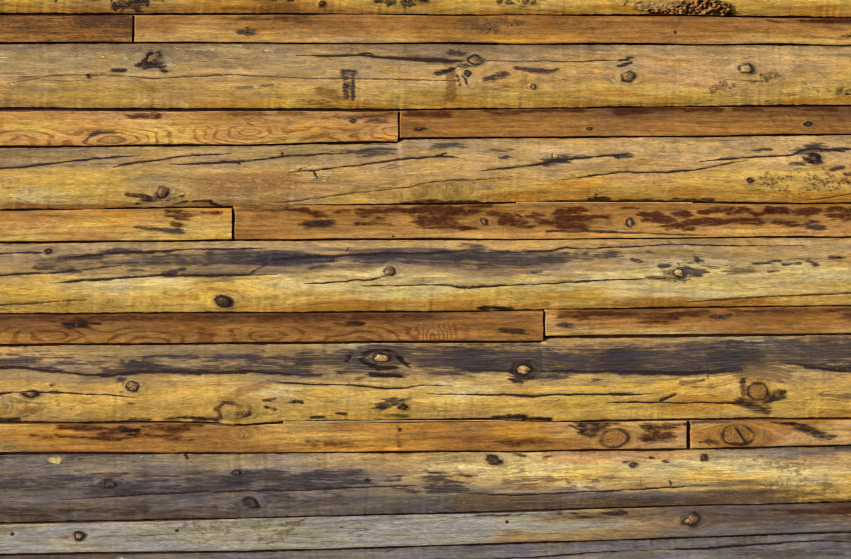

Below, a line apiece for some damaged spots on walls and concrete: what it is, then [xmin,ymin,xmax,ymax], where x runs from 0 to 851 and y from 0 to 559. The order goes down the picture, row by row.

crack [0,148,851,203]
crack [0,231,805,306]
crack [0,366,739,404]
crack [785,363,847,372]